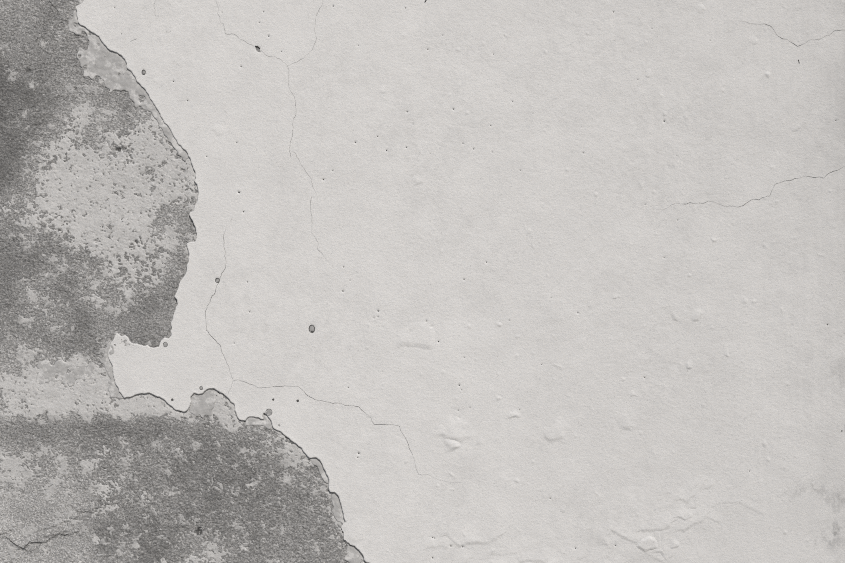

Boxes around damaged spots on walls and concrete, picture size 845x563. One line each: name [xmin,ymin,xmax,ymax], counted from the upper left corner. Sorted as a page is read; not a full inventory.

peeling [0,0,366,563]